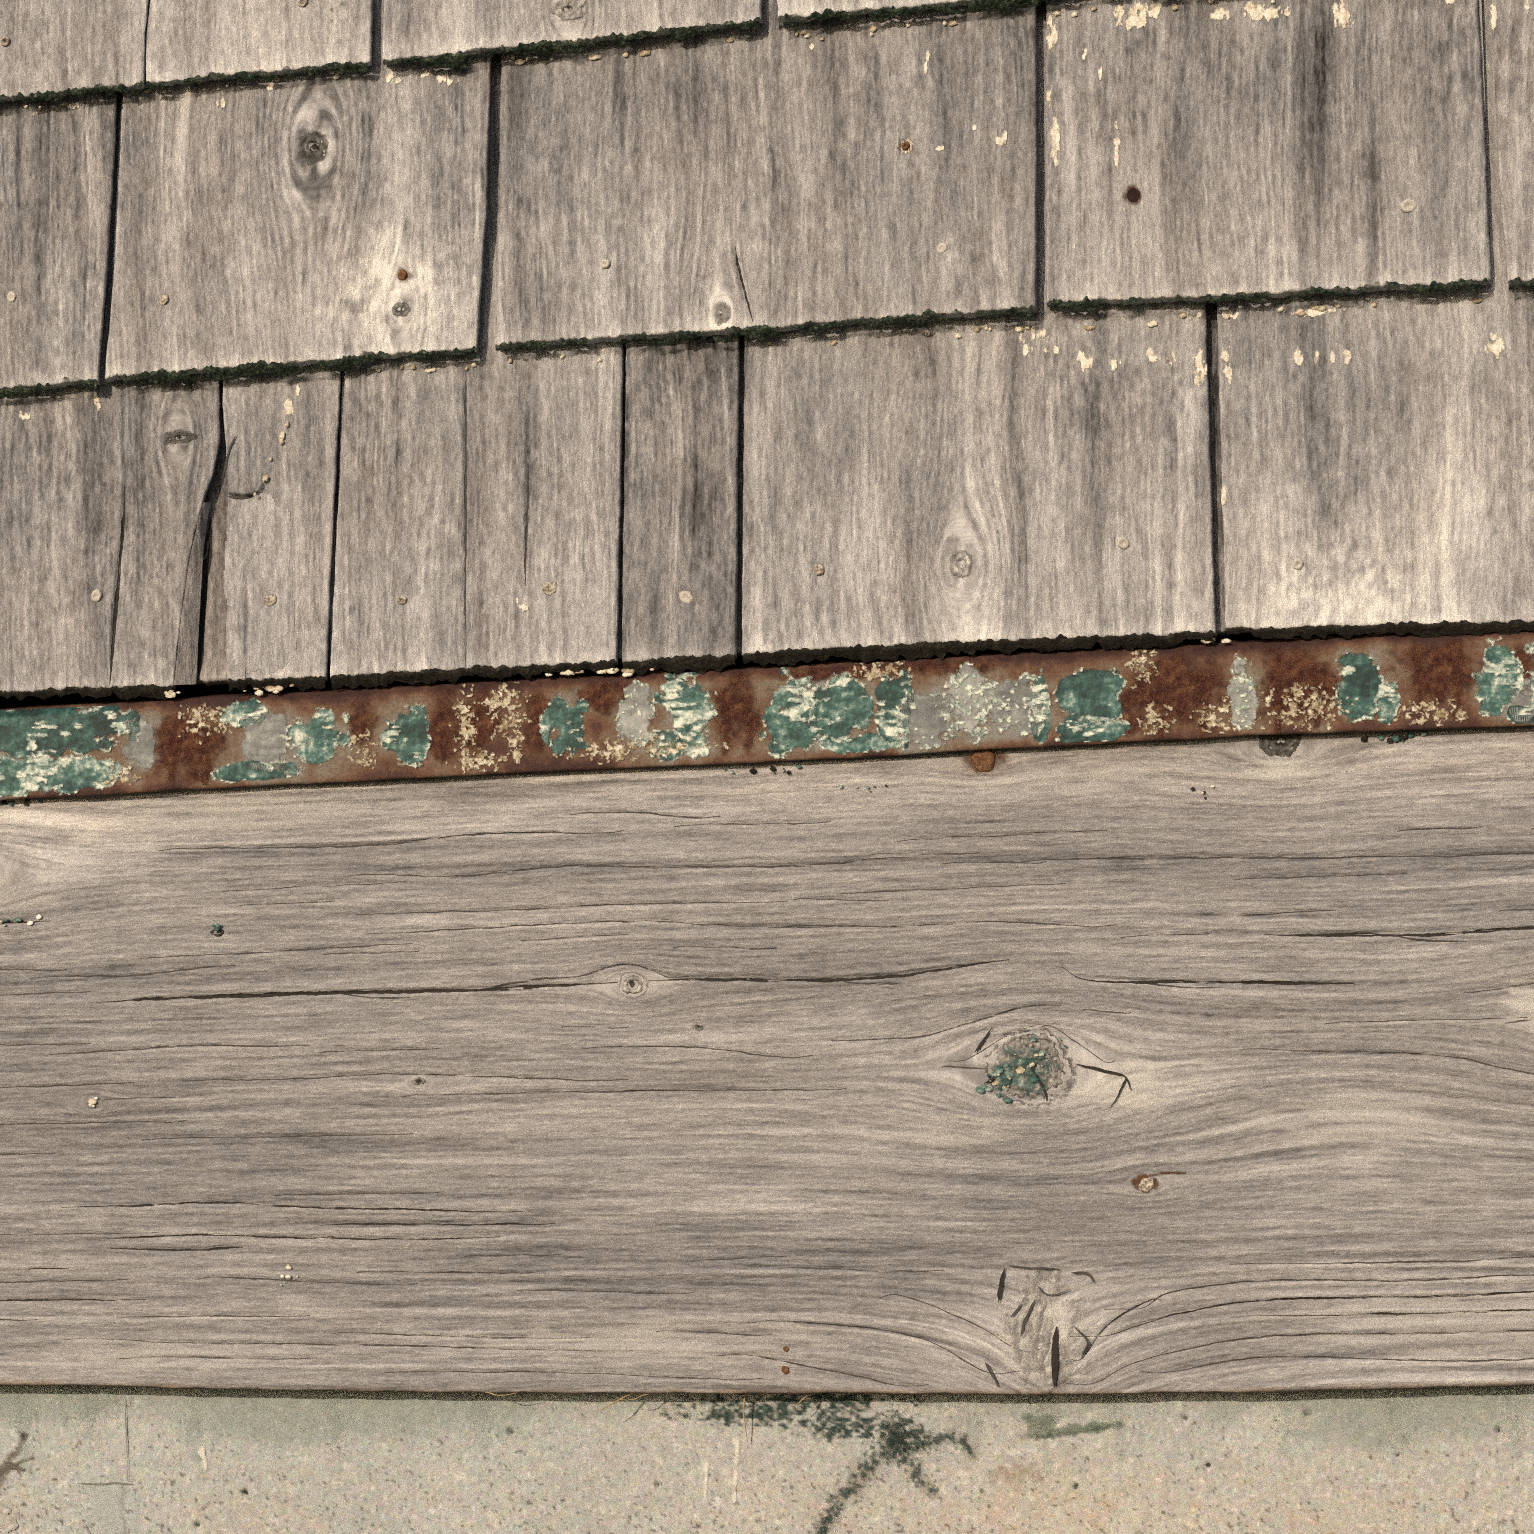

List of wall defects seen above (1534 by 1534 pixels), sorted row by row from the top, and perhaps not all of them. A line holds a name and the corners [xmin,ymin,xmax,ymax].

crack [197,519,212,681]
spalling [164,385,431,783]
peeling [0,705,155,806]
corrosion [154,716,226,785]
corrosion [426,689,500,760]
peeling [445,668,729,773]
peeling [723,636,1534,774]
corrosion [1261,647,1341,732]
crack [0,812,1534,1002]
crack [0,967,1354,1155]
crack [0,1192,1534,1387]
water stain [661,1393,971,1534]